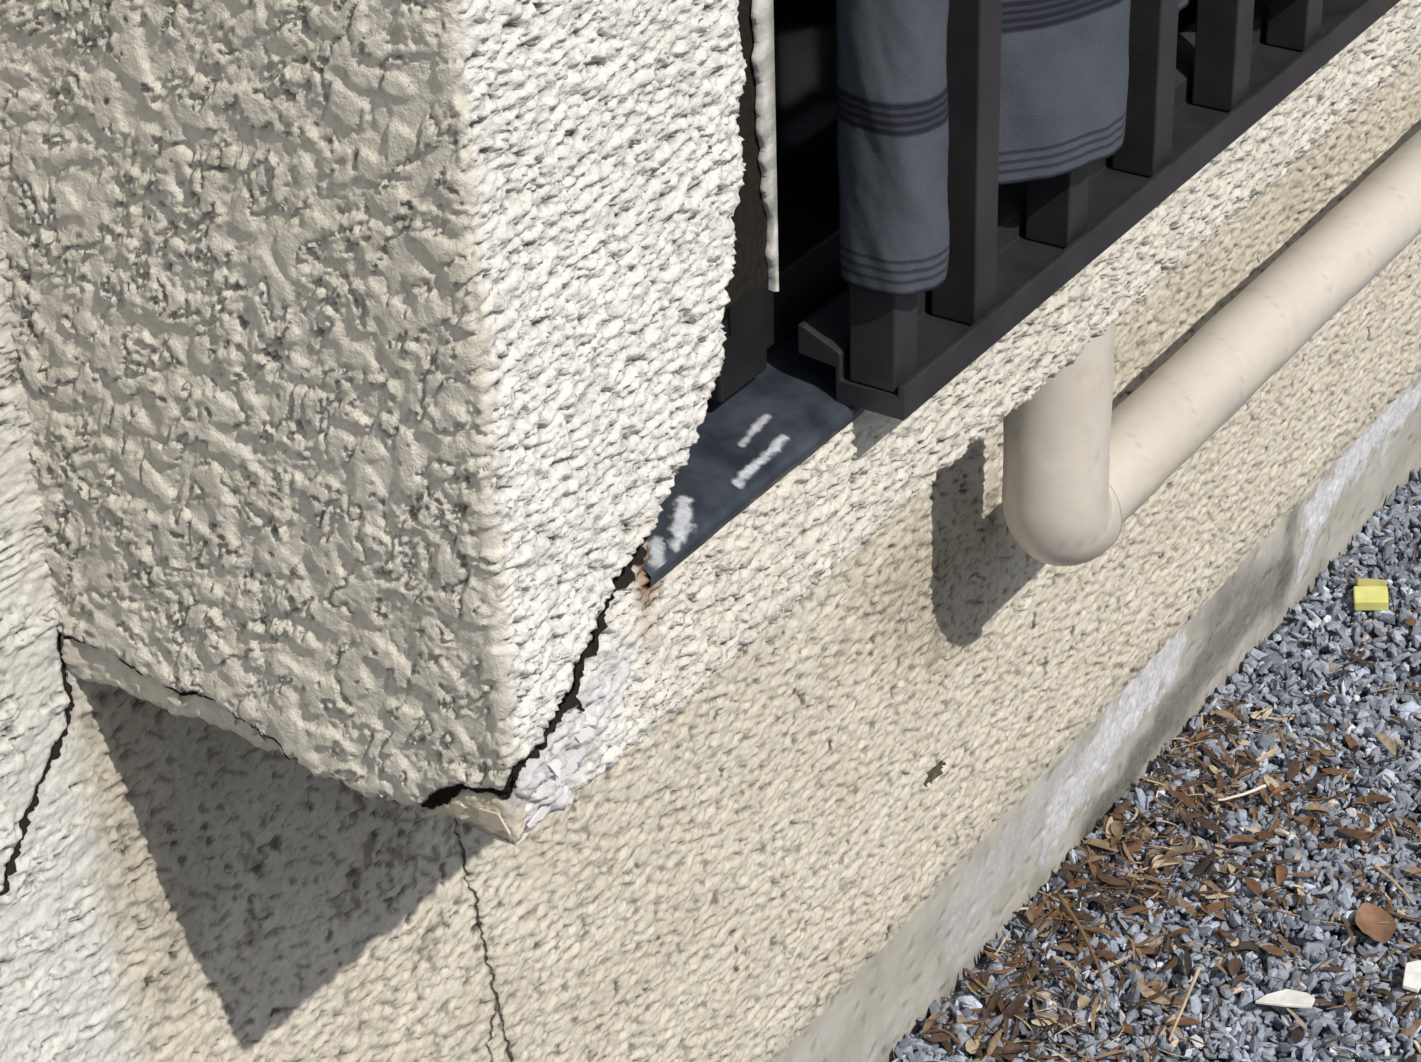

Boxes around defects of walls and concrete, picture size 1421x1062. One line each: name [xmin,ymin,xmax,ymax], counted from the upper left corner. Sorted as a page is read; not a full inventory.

crack [0,633,300,895]
crack [421,536,649,1062]